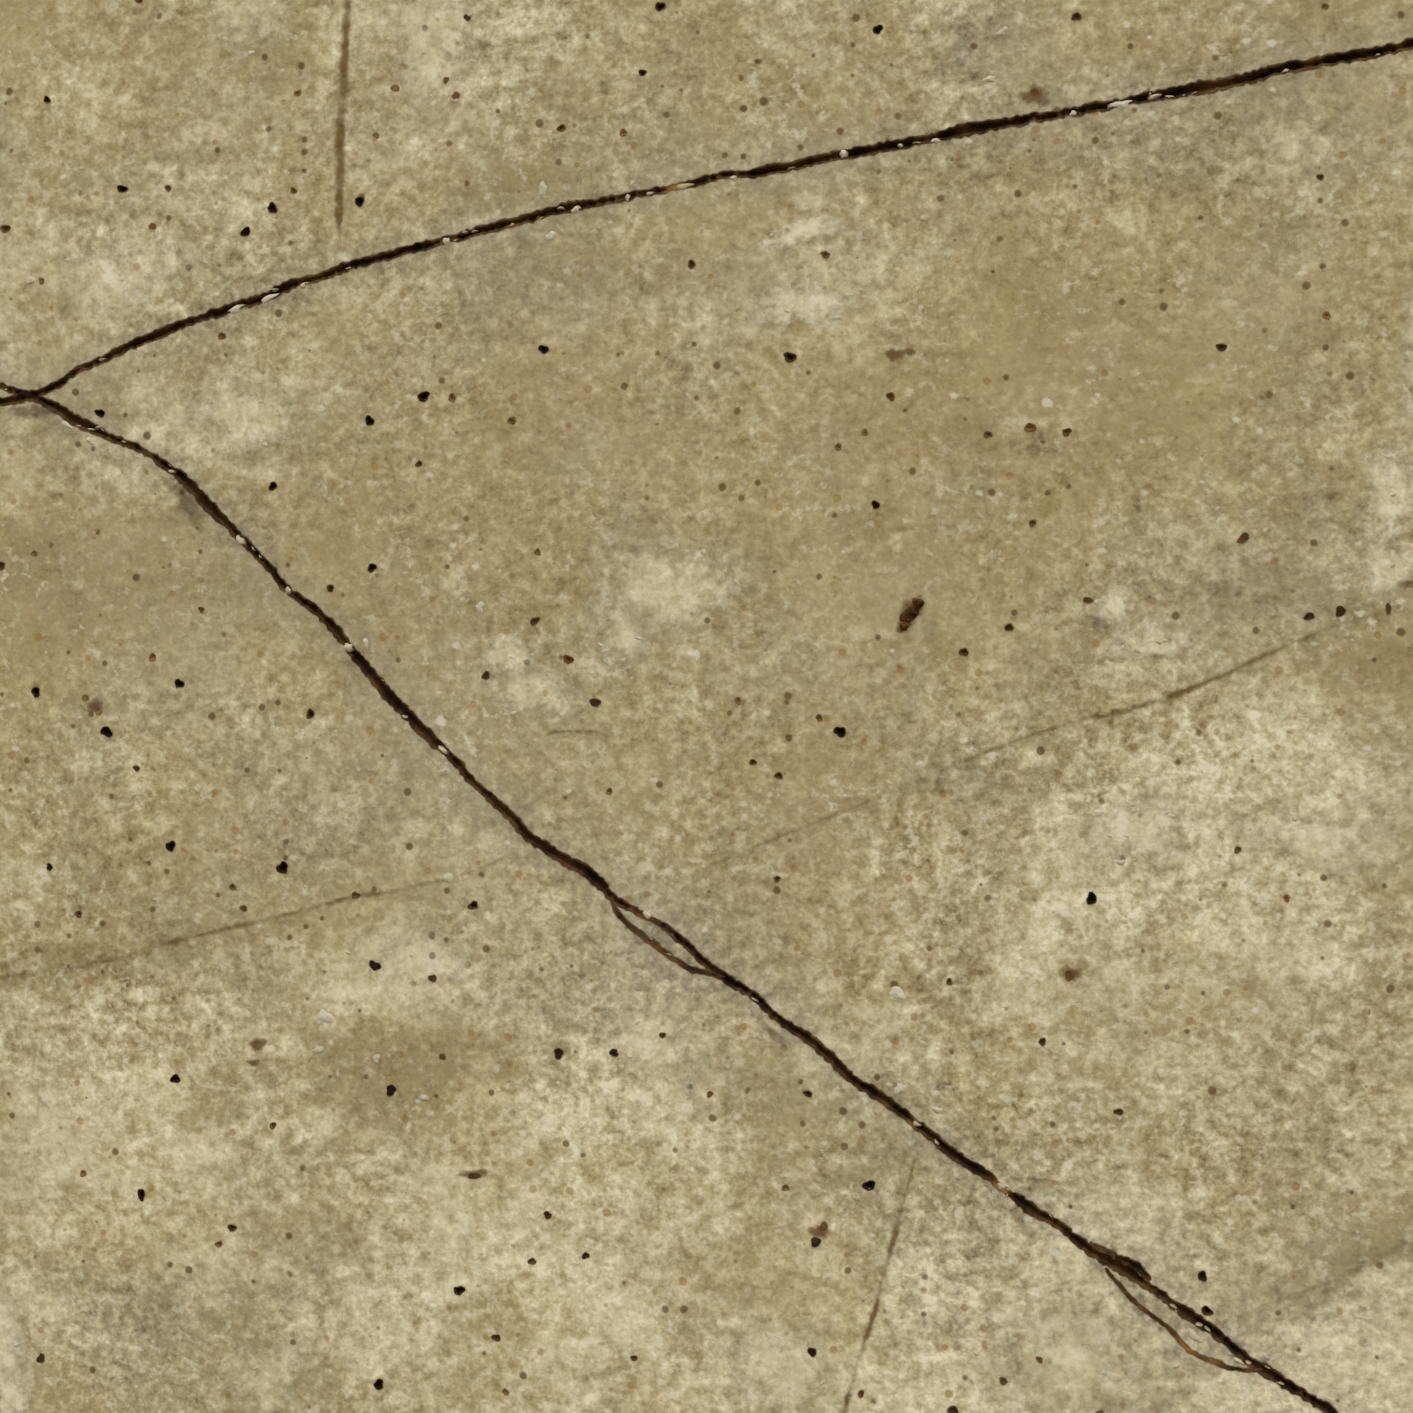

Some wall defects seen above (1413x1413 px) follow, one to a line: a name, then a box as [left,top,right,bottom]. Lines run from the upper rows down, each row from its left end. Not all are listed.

crack [0,37,1413,406]
crack [29,393,1338,1413]